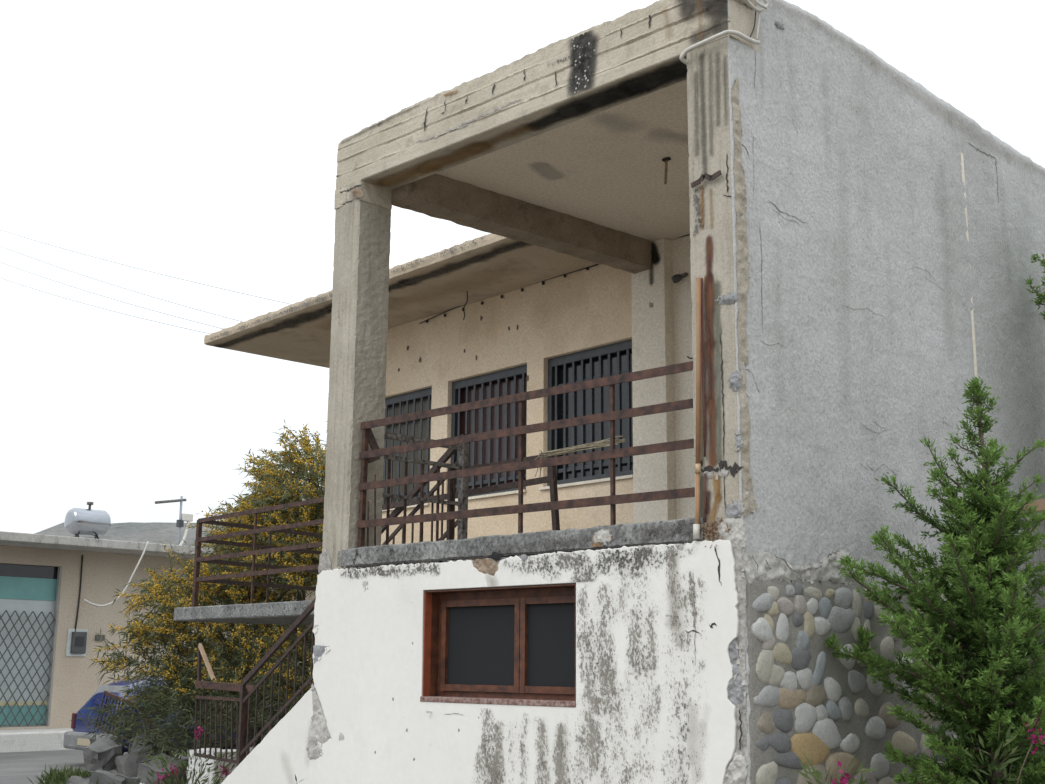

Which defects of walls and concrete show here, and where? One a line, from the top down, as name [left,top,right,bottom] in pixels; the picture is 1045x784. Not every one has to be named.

water stain [547,31,597,95]
water stain [376,127,531,186]
crack [759,201,808,253]
spalling [701,78,873,784]
spalling [471,550,503,576]
spalling [312,625,330,664]
water stain [474,476,705,784]
spalling [306,683,344,761]